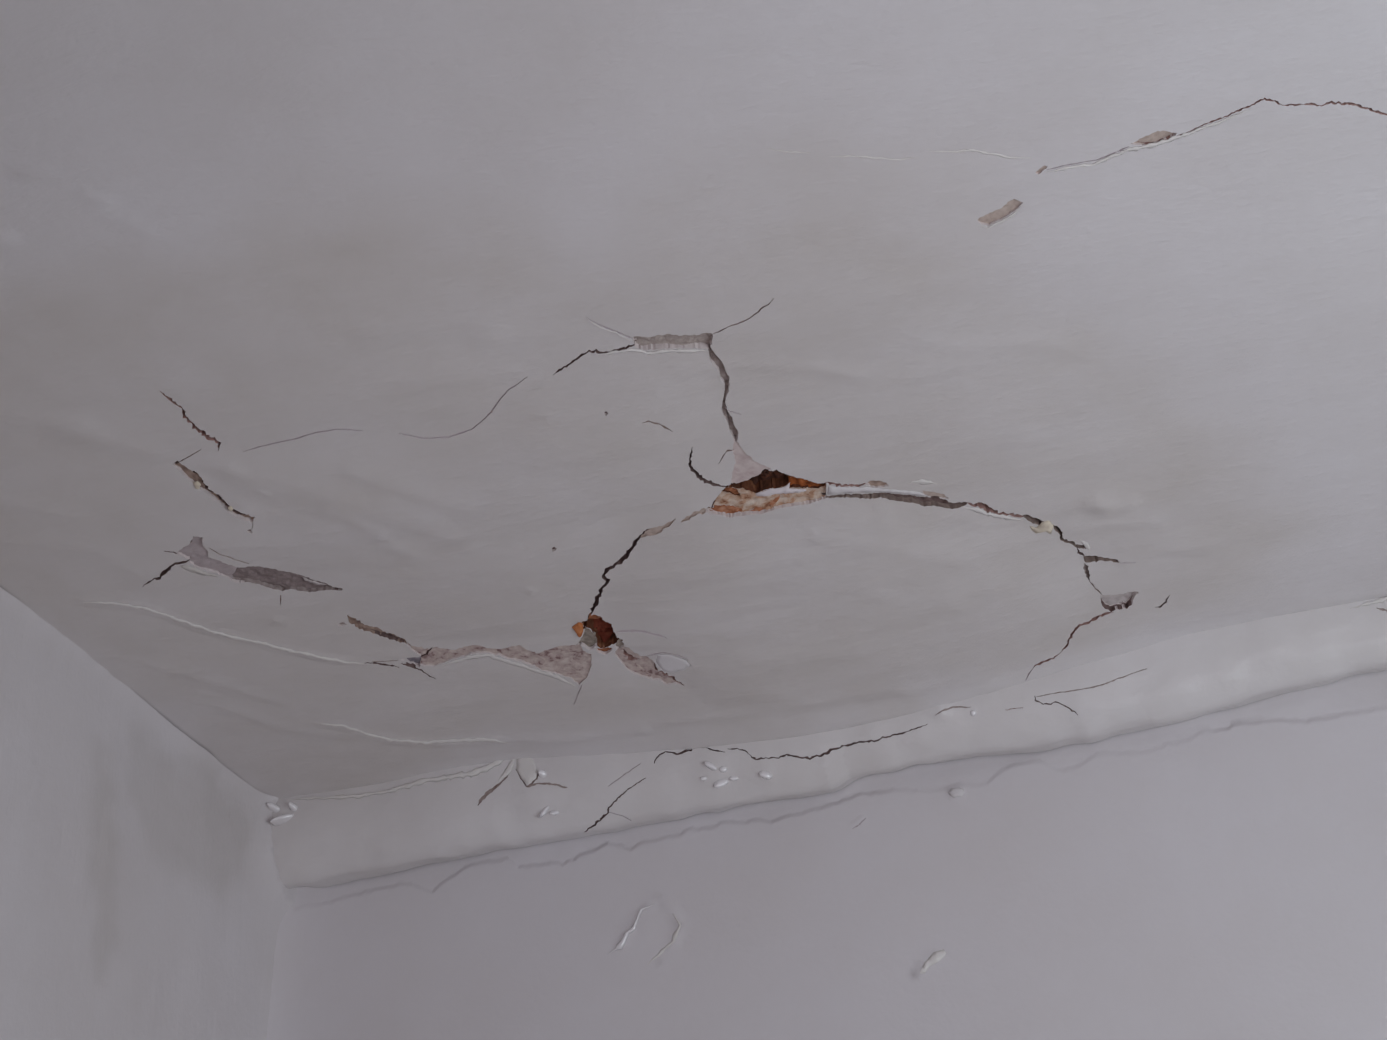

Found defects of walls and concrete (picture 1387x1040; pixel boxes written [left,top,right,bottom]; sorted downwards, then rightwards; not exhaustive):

crack [768,97,1387,174]
spalling [978,199,1023,229]
crack [160,391,362,533]
crack [399,298,774,614]
spalling [706,440,826,518]
spalling [143,536,343,605]
crack [338,615,407,644]
peeling [367,613,691,703]
crack [821,479,1145,715]
crack [585,706,969,832]